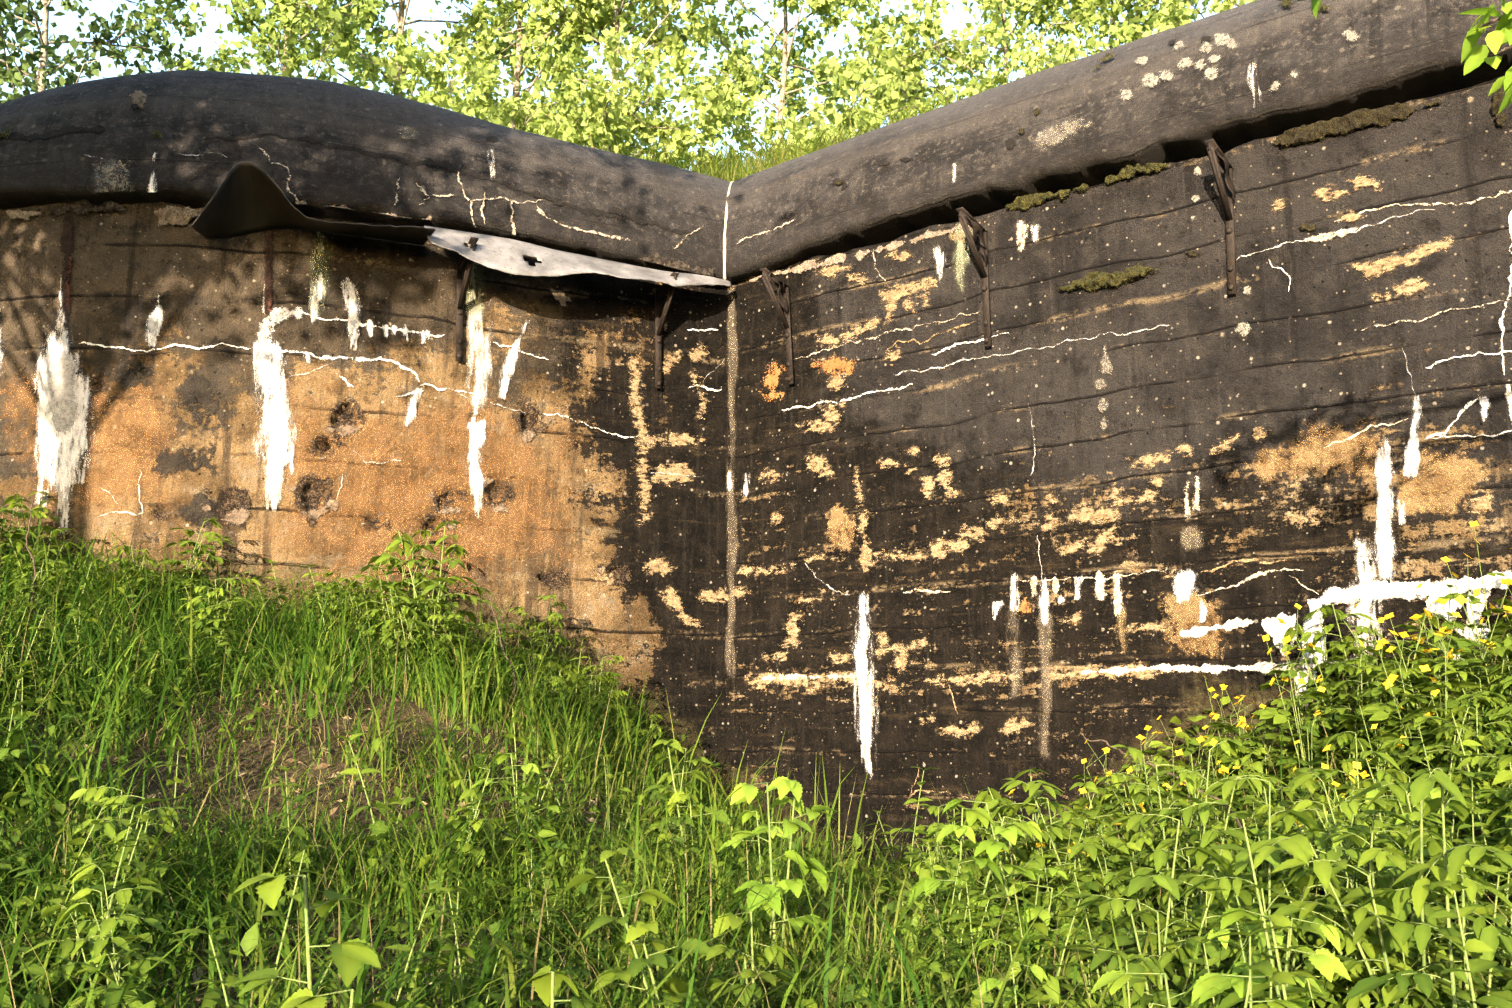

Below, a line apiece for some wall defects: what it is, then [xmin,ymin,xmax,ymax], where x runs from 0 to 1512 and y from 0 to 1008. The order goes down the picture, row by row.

crack [181,133,707,249]
water stain [34,312,160,533]
efflorescence [253,231,360,509]
crack [79,312,637,497]
water stain [465,262,548,513]
peeling [603,342,710,525]
spalling [743,221,981,434]
peeling [744,596,1022,695]
peeling [592,426,1274,627]
crack [784,312,1169,411]
water stain [992,396,1512,710]
crack [1238,190,1512,447]